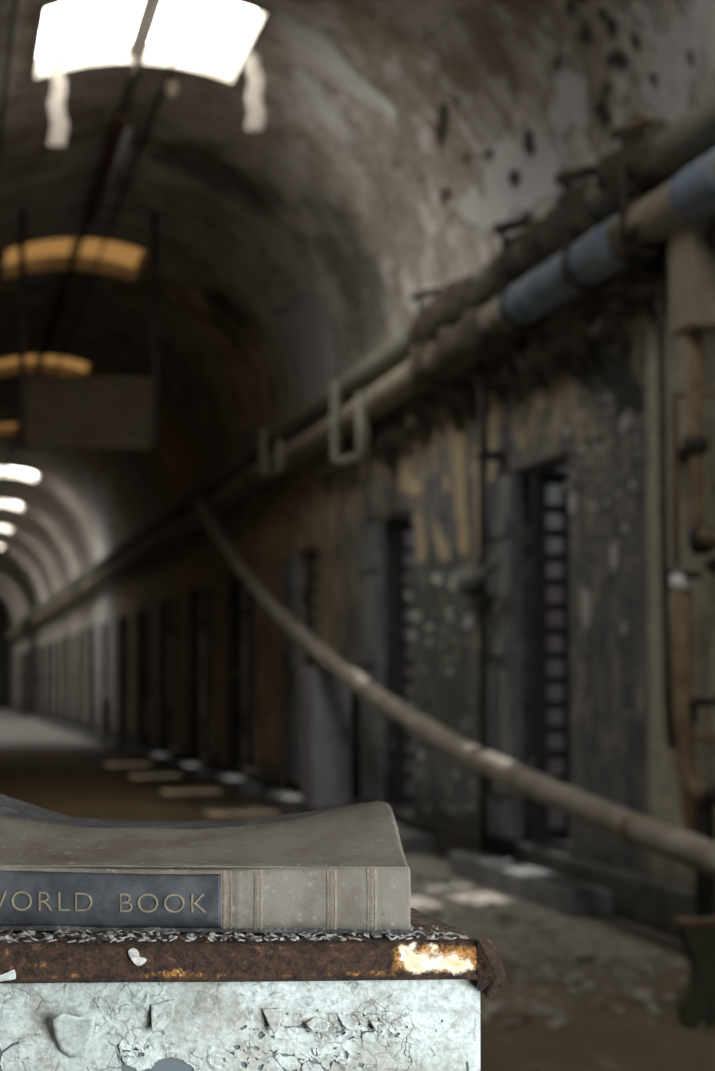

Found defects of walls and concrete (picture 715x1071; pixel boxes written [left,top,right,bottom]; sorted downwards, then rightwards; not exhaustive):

peeling [267,7,399,151]
spalling [434,97,460,151]
peeling [441,0,715,239]
peeling [400,461,424,498]
peeling [409,397,499,675]